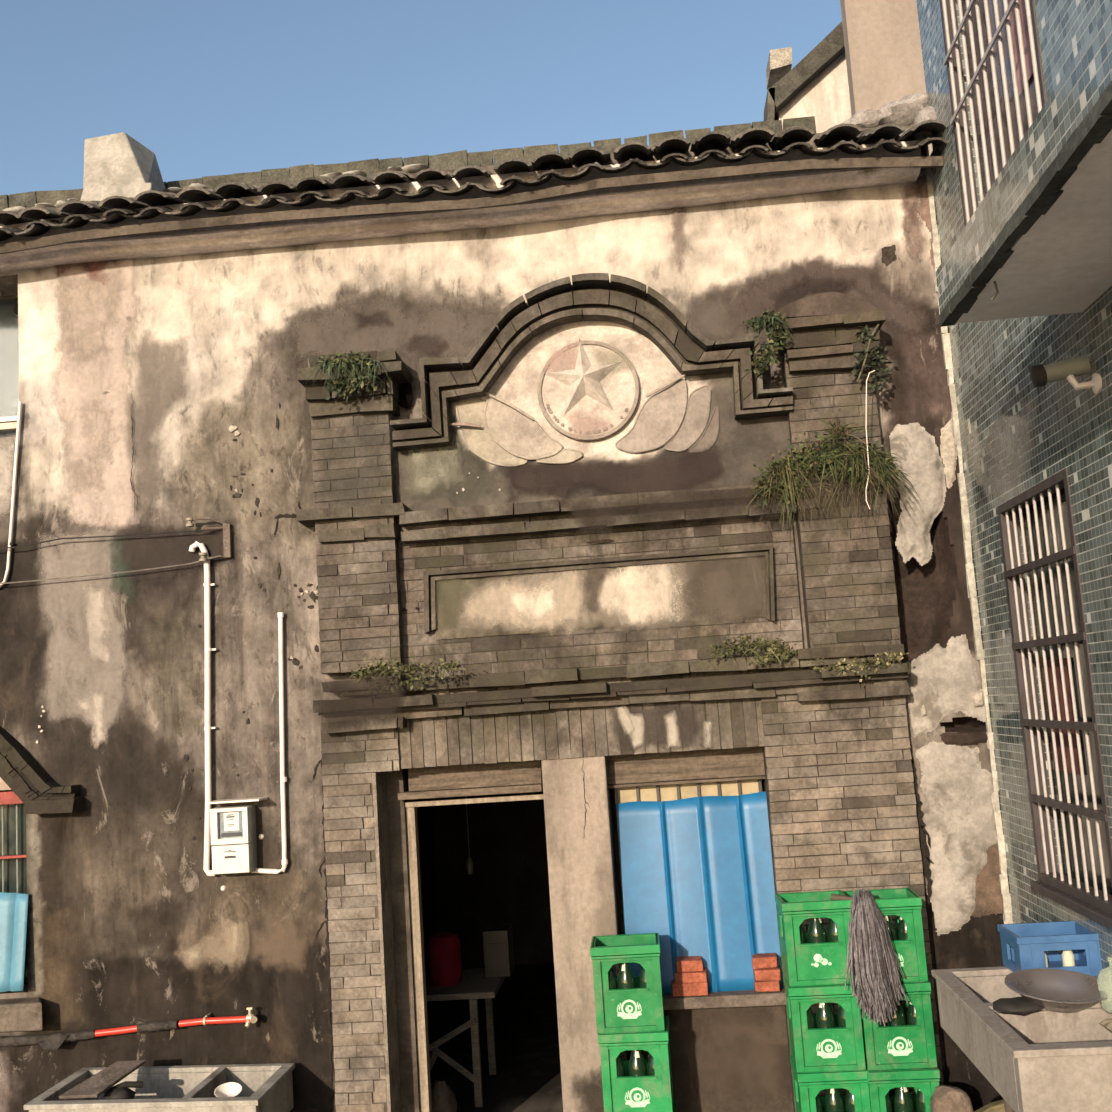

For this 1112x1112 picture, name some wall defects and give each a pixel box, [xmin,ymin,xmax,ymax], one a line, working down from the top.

damp [903,184,923,253]
damp [40,259,224,746]
damp [457,551,770,632]
peeling [889,497,998,936]
damp [180,924,249,968]
damp [263,925,304,967]